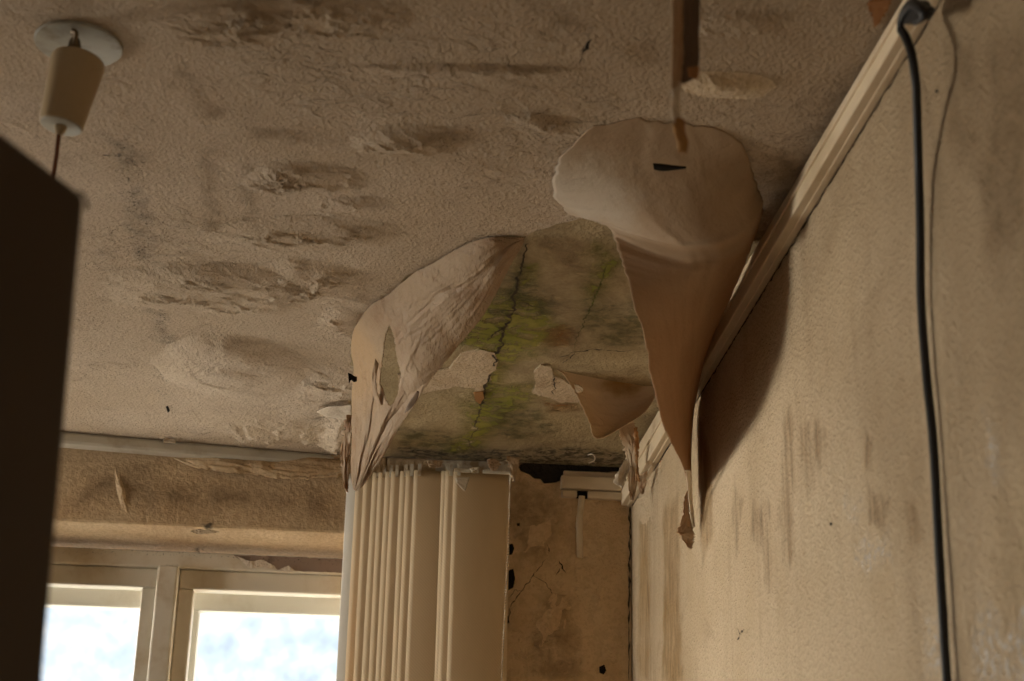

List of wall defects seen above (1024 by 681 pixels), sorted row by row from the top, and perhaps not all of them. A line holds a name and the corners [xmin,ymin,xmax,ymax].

crack [466,244,545,450]
peeling [340,117,765,681]
crack [508,545,566,623]